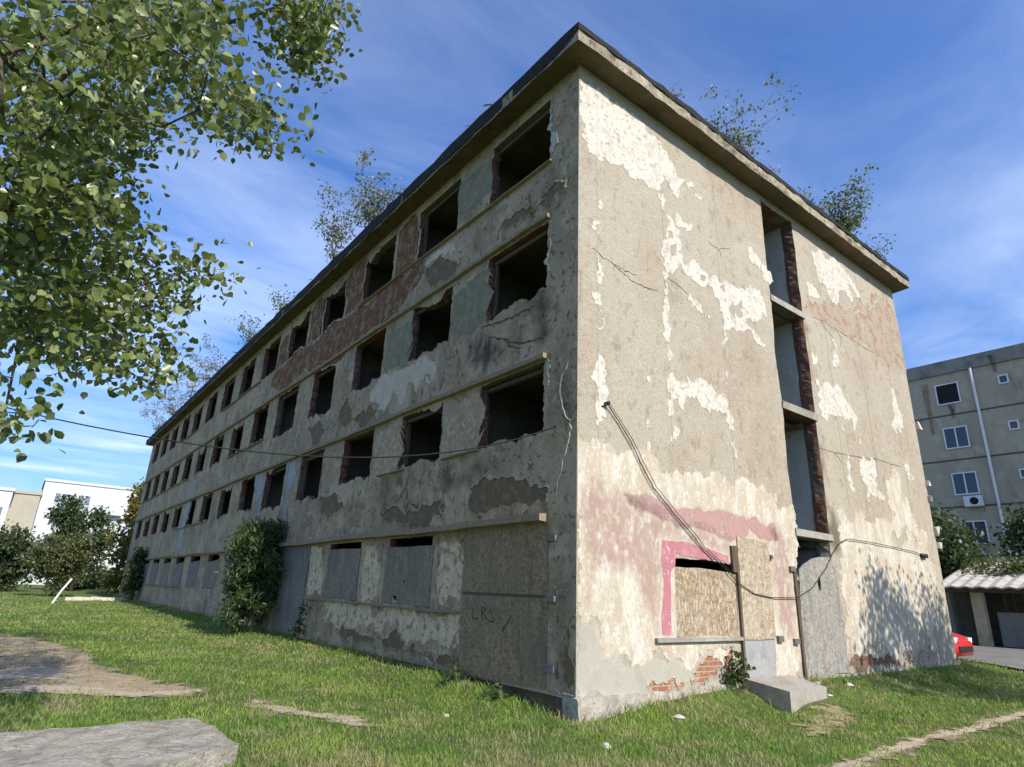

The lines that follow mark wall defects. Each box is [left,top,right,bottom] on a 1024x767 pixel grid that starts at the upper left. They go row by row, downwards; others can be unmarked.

flaking render [270,211,461,480]
crack [593,248,689,295]
peeling [579,79,773,459]
flaking render [802,249,906,378]
flaking render [319,489,345,523]
flaking render [380,497,449,538]
flaking render [467,473,553,518]
peeling [562,354,802,697]
peeling [811,352,939,672]
peeling [307,540,464,671]